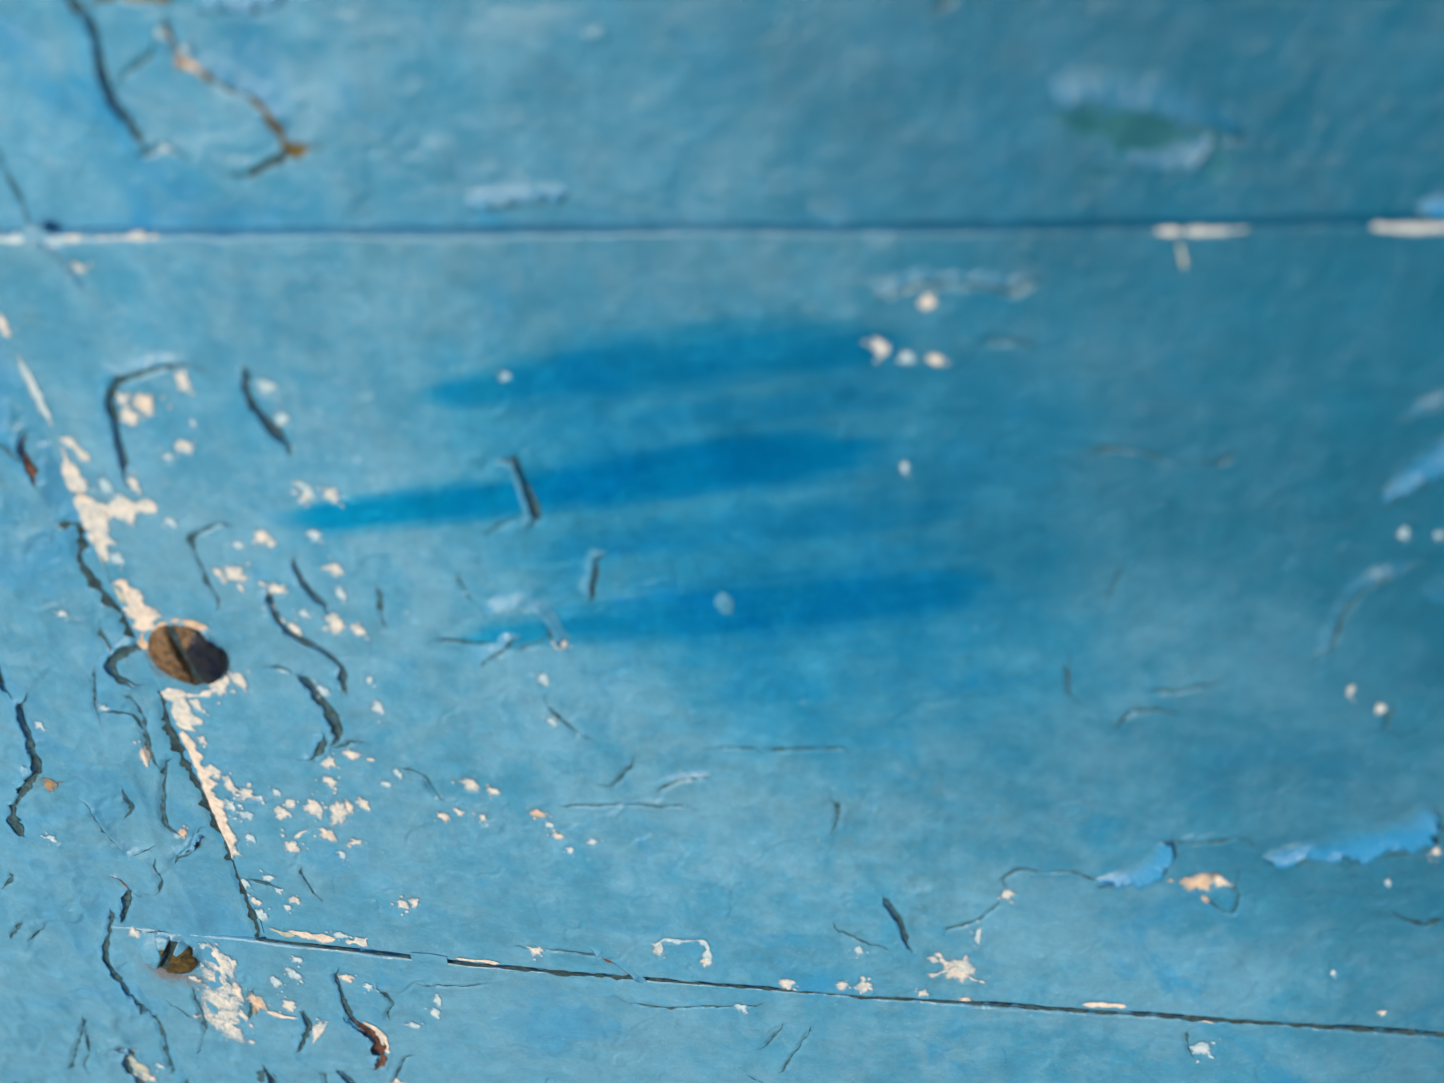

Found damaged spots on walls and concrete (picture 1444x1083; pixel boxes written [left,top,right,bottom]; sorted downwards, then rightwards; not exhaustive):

crack [55,0,324,177]
crack [0,431,38,490]
spalling [0,314,210,650]
crack [94,351,291,486]
crack [485,454,541,536]
spalling [209,528,369,640]
crack [0,672,42,838]
spalling [160,670,402,862]
crack [51,521,1444,1083]
peeling [1262,801,1444,871]
spalling [240,869,368,947]
spalling [188,943,328,1045]